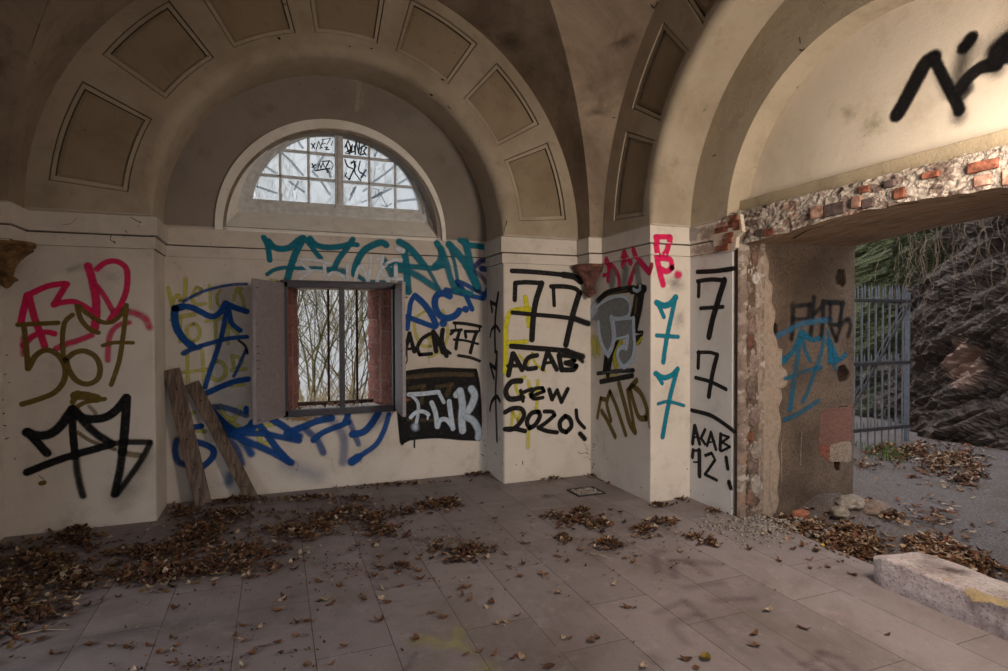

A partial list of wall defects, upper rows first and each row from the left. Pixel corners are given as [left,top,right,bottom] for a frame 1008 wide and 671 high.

spalling [689,214,788,518]
spalling [819,405,853,470]